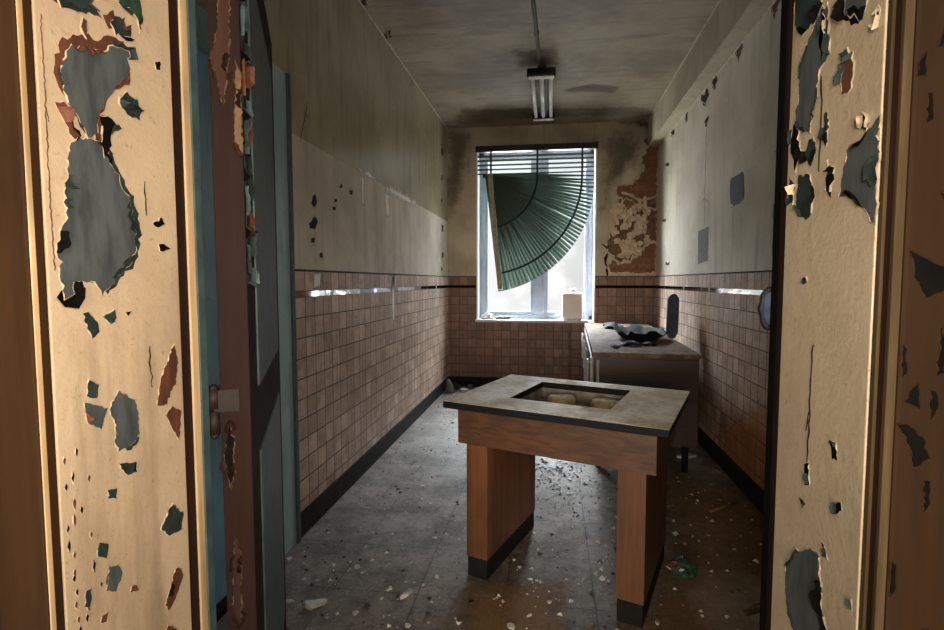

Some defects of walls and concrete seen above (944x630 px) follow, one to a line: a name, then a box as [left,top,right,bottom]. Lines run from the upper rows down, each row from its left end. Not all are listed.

peeling [53,0,144,339]
peeling [208,0,260,288]
peeling [603,132,670,276]
peeling [701,74,718,127]
peeling [785,0,883,225]
peeling [909,250,944,299]
peeling [83,379,140,476]
peeling [156,344,182,441]
peeling [62,447,139,630]
peeling [160,503,184,536]
peeling [165,567,184,611]
peeling [783,543,829,630]